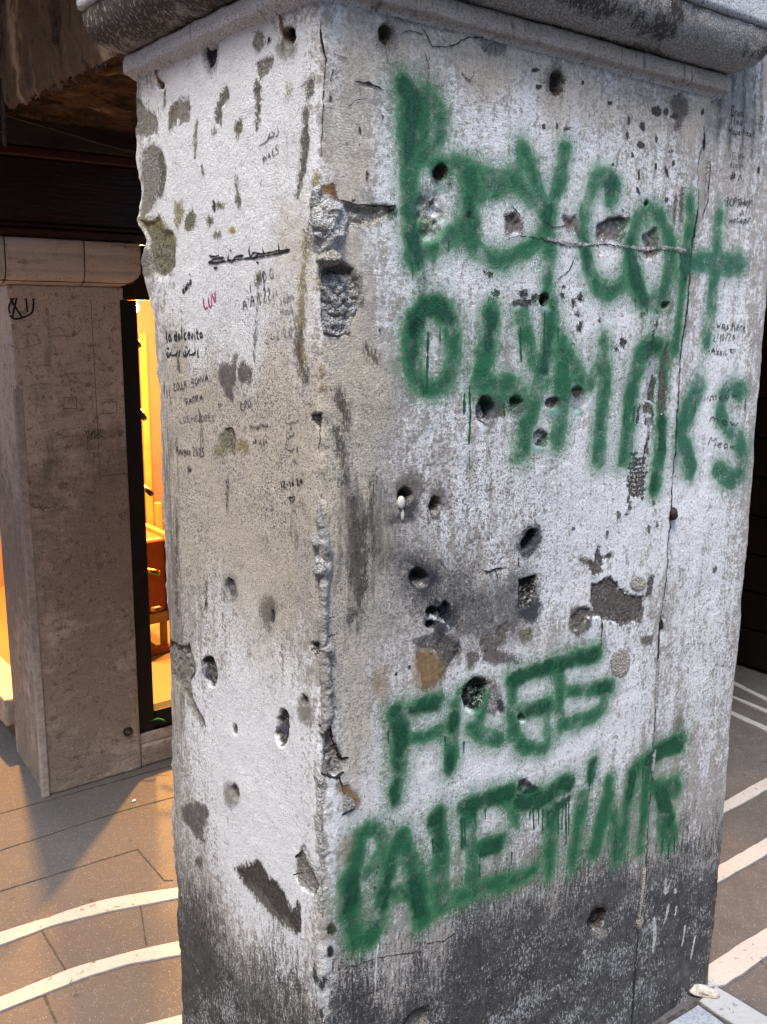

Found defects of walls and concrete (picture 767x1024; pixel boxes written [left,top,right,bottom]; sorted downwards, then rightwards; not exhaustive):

spalling [313,260,364,337]
peeling [568,343,670,646]
crack [506,133,711,1024]
spalling [170,638,206,729]
peeling [234,859,302,934]
spalling [293,724,349,1022]
leakage [652,878,677,953]